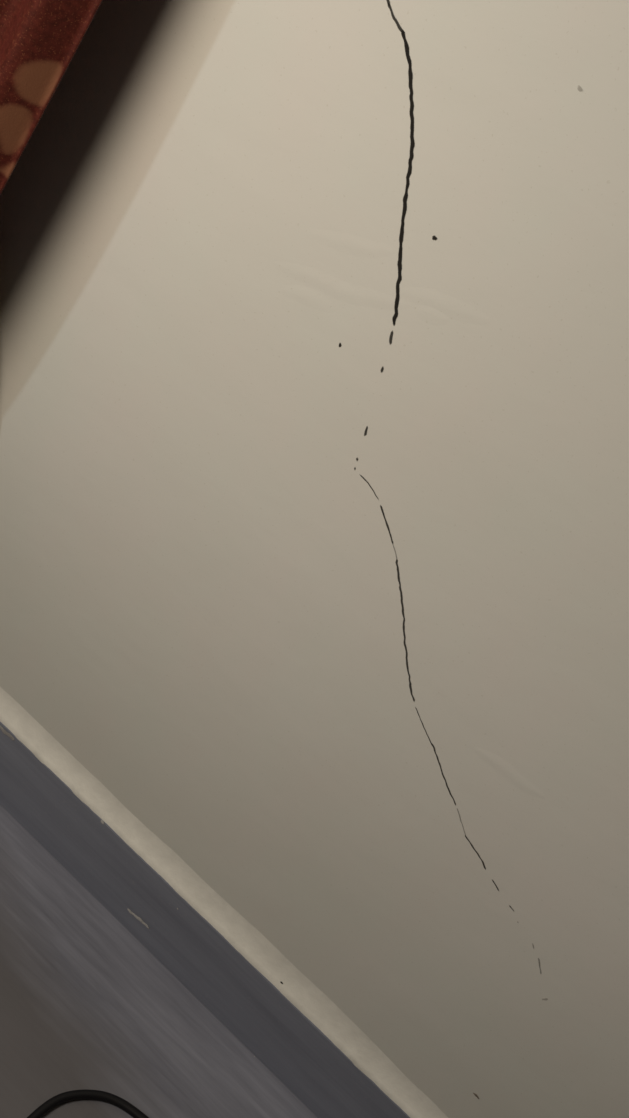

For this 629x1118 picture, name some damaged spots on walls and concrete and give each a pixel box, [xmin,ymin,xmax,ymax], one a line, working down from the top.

crack [381,0,415,372]
crack [354,427,456,805]
crack [465,835,514,911]